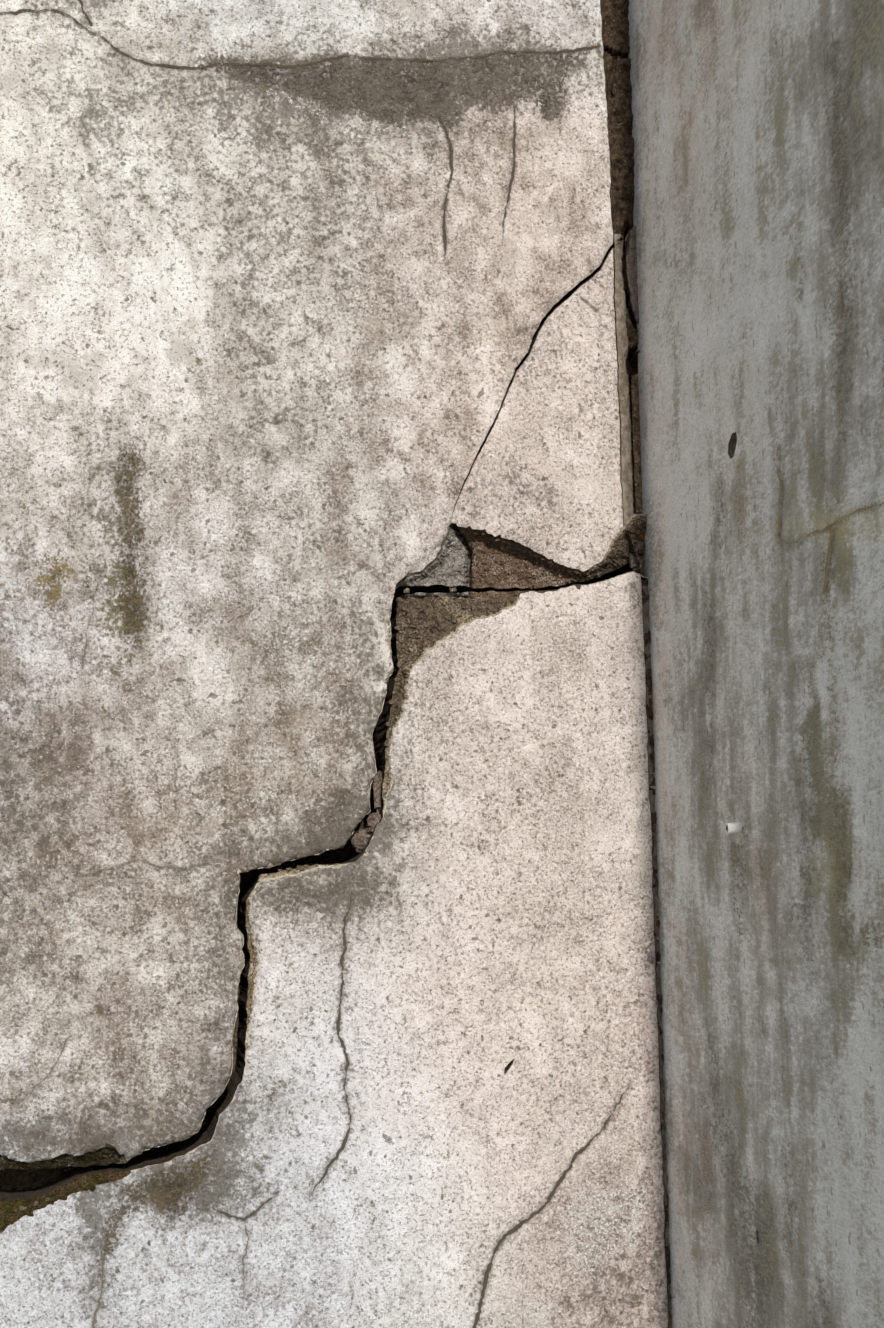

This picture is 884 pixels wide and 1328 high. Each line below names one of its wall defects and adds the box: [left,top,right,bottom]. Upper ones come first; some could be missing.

crack [0,0,600,69]
water stain [199,47,589,143]
crack [452,196,640,516]
water stain [823,41,858,441]
spalling [389,523,589,727]
crack [0,514,649,1280]
water stain [790,723,884,961]
crack [92,1253,105,1328]
crack [472,1086,630,1328]
water stain [706,1042,797,1328]